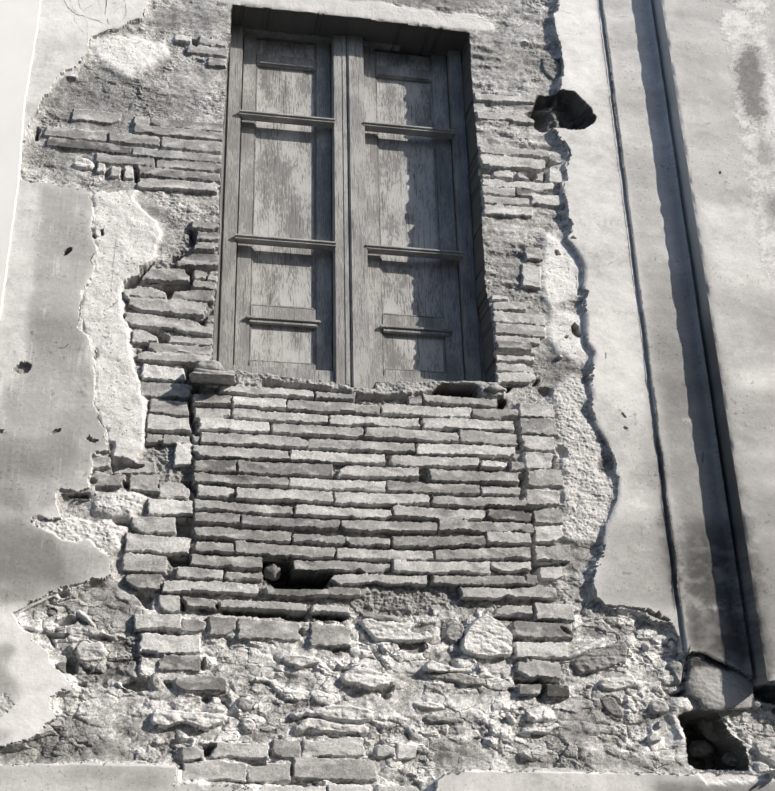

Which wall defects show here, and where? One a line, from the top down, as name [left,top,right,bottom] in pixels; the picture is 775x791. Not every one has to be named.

crack [64,0,142,54]
spalling [20,0,327,465]
spalling [0,191,775,791]
spalling [378,0,620,587]
water stain [719,0,775,281]